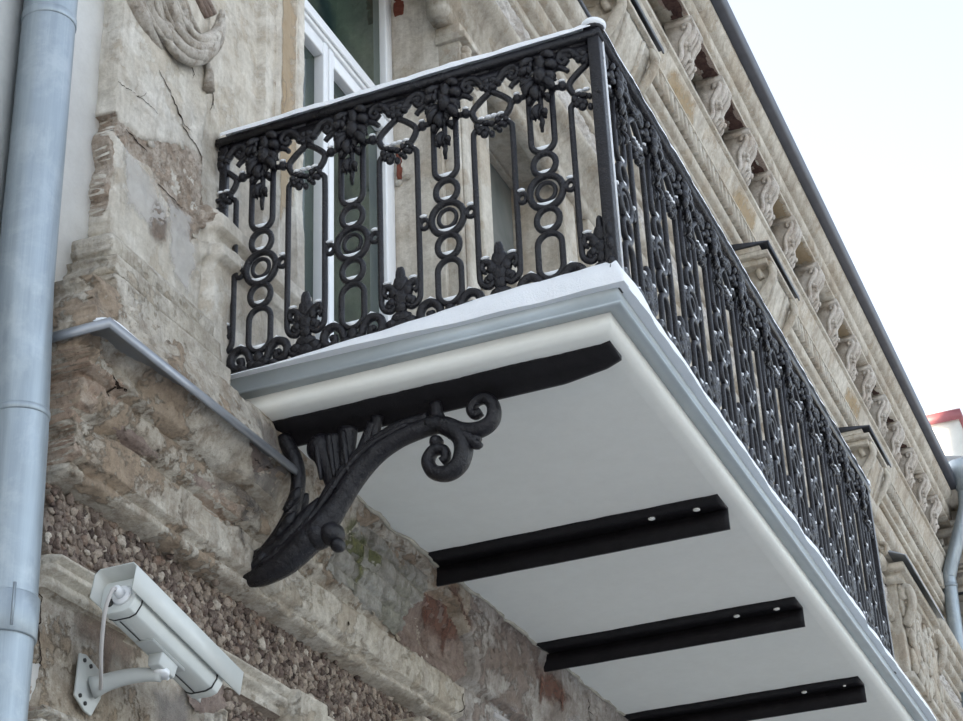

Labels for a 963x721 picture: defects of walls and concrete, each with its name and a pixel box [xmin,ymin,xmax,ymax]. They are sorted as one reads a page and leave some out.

flaking render [88,112,218,286]
crack [121,70,202,157]